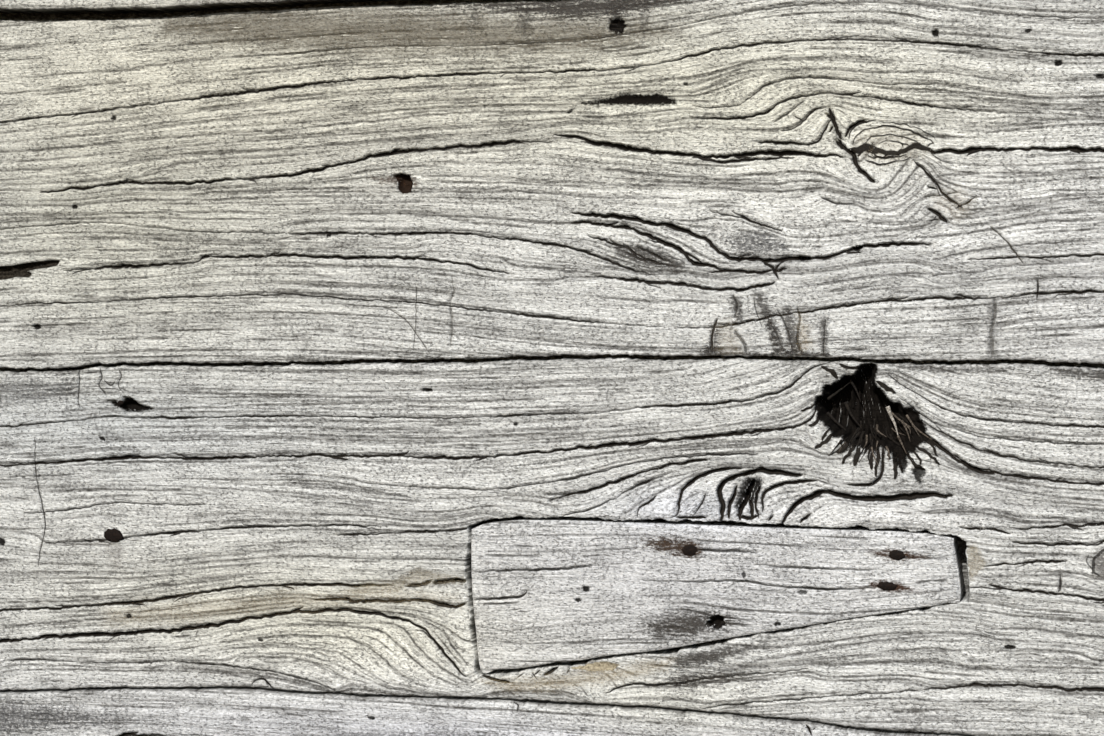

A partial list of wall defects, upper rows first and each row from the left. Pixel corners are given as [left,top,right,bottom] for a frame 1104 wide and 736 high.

crack [40,76,988,193]
crack [0,221,102,230]
crack [65,147,1104,292]
crack [0,290,1104,329]
crack [0,361,953,565]
crack [888,374,1104,486]
rust [641,536,703,562]
crack [684,566,865,591]
crack [960,522,1104,604]
crack [0,565,590,711]
crack [606,668,1104,735]